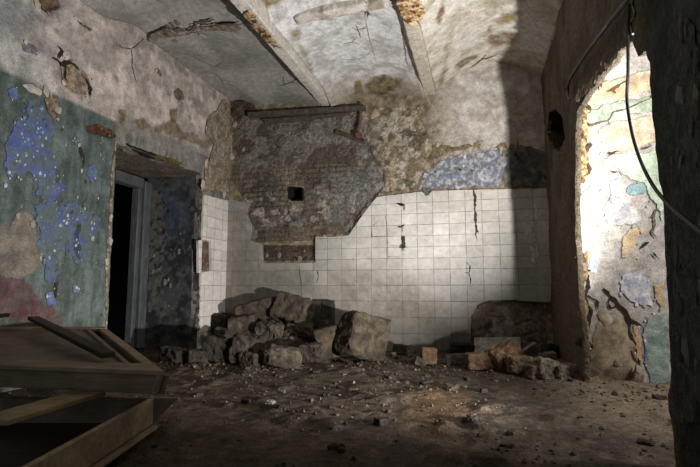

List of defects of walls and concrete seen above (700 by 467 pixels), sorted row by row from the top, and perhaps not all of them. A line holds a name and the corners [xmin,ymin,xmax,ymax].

spalling [60,51,93,99]
crack [119,19,242,82]
spalling [147,20,241,42]
spalling [243,11,280,48]
spalling [396,0,425,27]
spalling [575,44,664,259]
peeling [0,84,118,326]
spalling [189,96,565,331]
crack [472,190,480,239]
peeling [147,188,181,313]